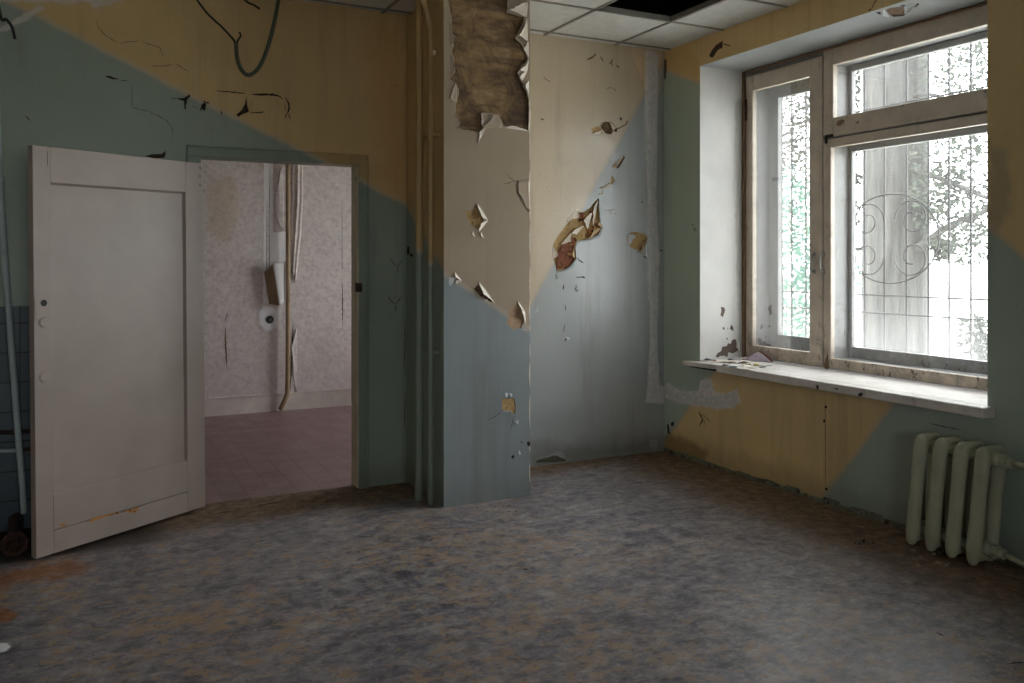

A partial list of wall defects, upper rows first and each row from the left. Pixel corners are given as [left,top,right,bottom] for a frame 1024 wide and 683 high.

spalling [876,3,919,17]
peeling [707,39,730,60]
spalling [446,0,531,143]
crack [105,76,173,145]
crack [218,90,290,118]
spalling [591,117,628,135]
peeling [464,204,488,237]
peeling [551,156,625,280]
peeling [627,232,651,253]
peeling [474,282,495,304]
peeling [506,302,530,333]
peeling [715,307,776,362]